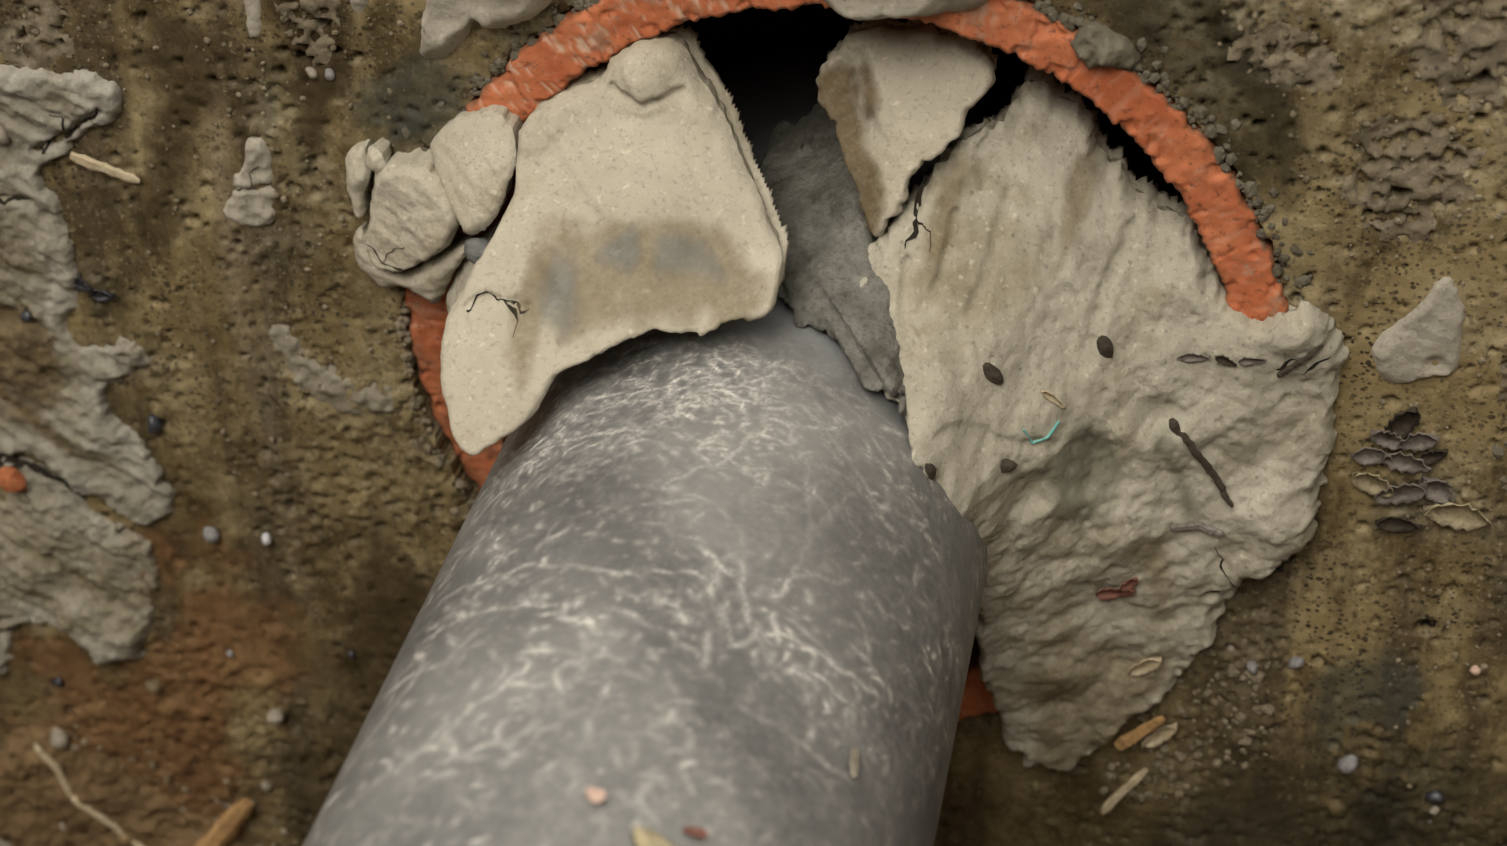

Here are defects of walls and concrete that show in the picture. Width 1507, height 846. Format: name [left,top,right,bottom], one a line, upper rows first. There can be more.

spalling [1227,21,1344,96]
crack [34,107,97,154]
crack [904,175,931,252]
crack [466,291,530,337]
crack [0,453,126,533]